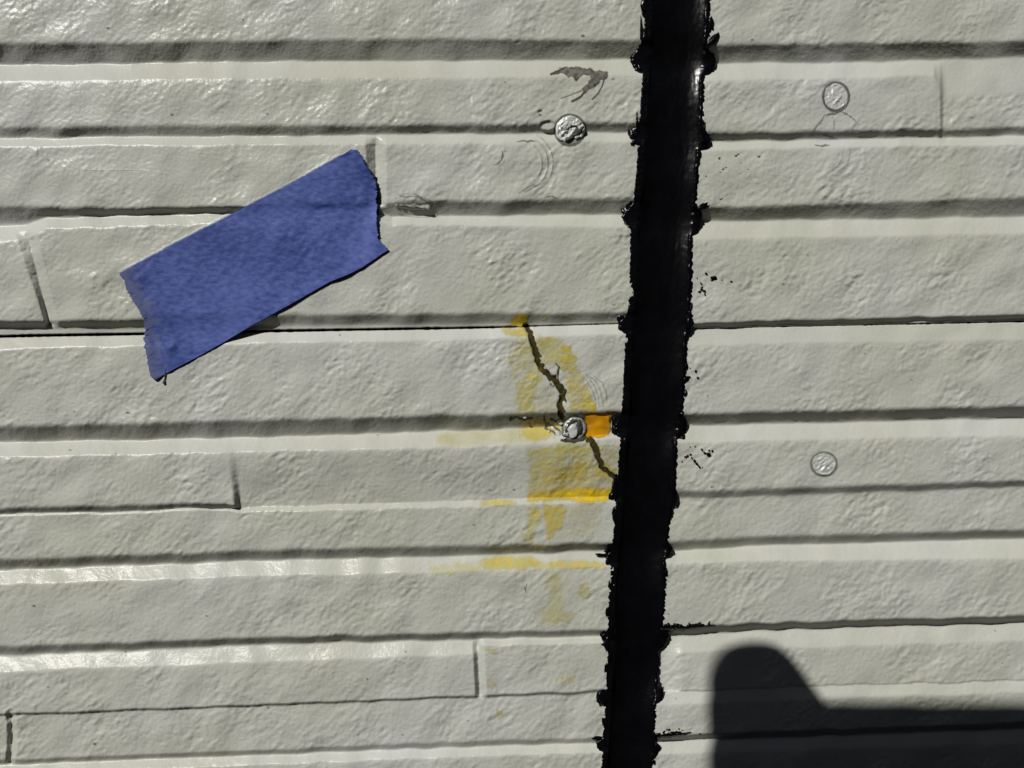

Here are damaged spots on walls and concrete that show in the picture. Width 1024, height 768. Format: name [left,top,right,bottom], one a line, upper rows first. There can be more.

crack [523,324,614,478]